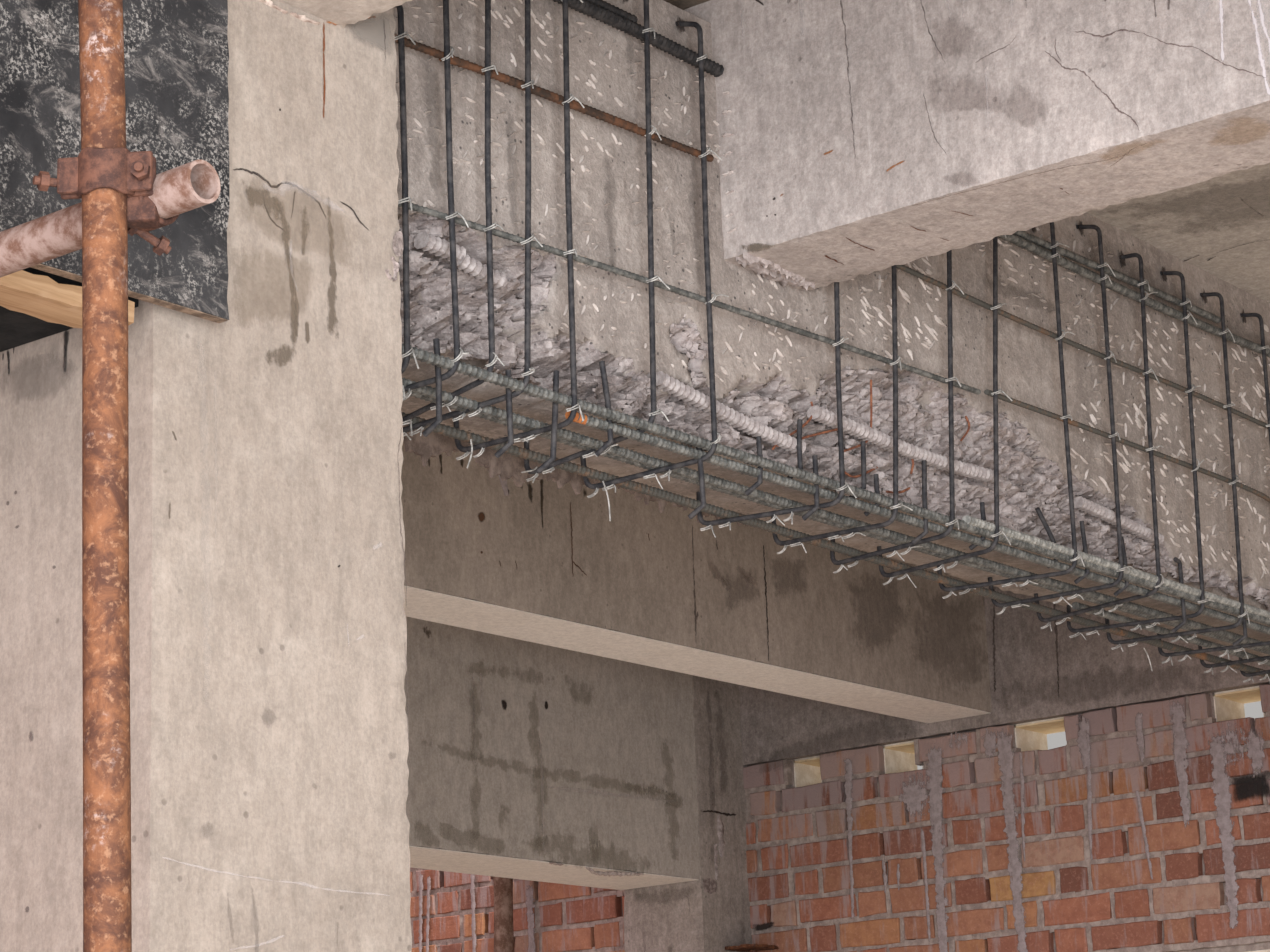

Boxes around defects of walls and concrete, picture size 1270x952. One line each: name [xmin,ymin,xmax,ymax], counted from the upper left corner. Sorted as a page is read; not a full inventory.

crack [840,1,856,156]
crack [1045,29,1266,130]
water stain [246,187,310,366]
crack [233,168,368,232]
water stain [328,201,337,332]
spalling [385,213,1270,611]